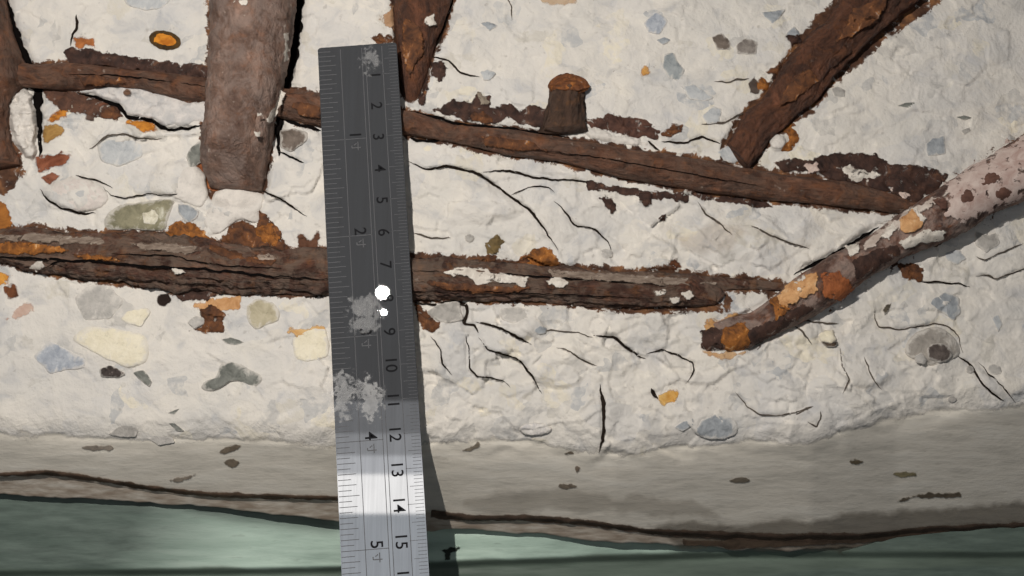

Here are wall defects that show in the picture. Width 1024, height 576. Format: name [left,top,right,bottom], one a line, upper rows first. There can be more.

spalling [8,0,210,77]
rust [35,30,208,184]
spalling [0,87,327,249]
rust [372,6,548,152]
crack [408,110,611,250]
rust [586,180,772,214]
spalling [398,0,1024,197]
rust [774,123,948,233]
spalling [0,263,336,468]
crack [415,300,695,452]
spalling [402,135,1024,472]
crack [874,312,1015,402]